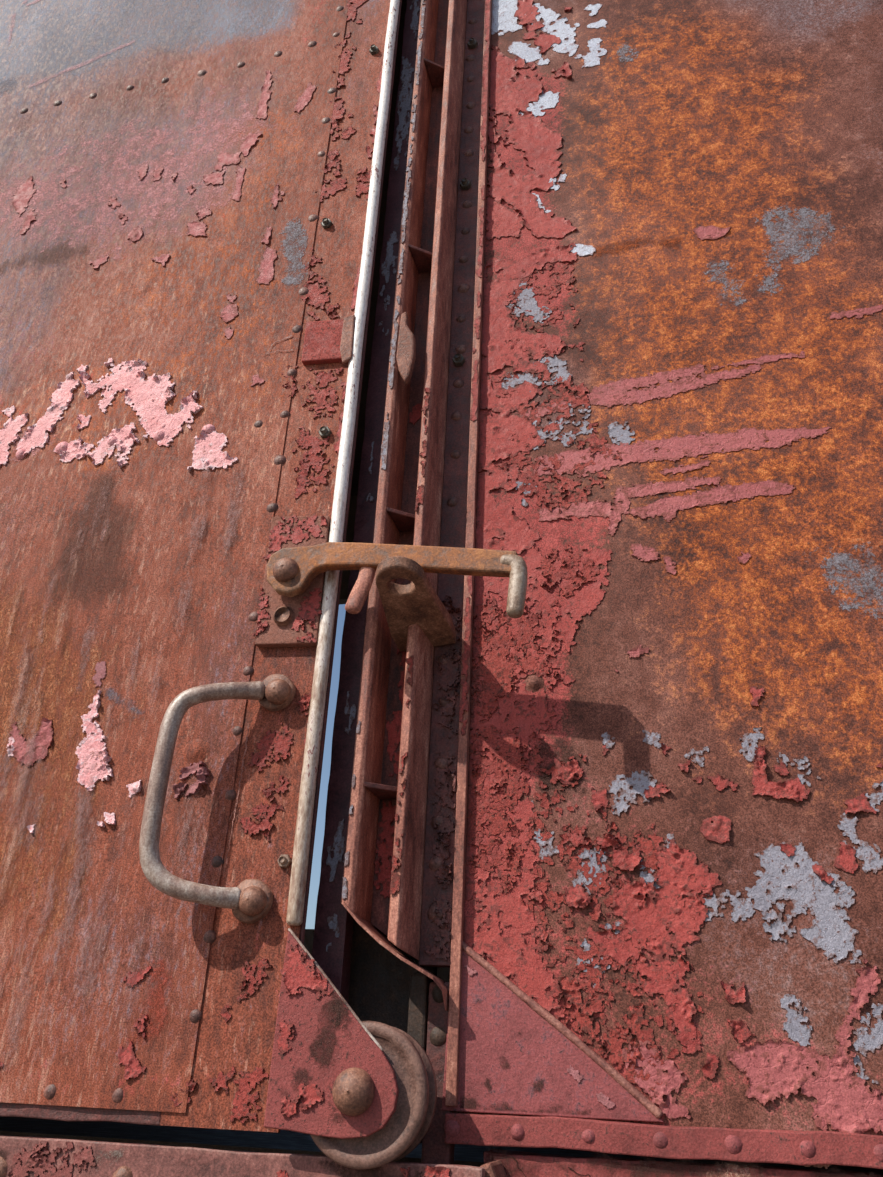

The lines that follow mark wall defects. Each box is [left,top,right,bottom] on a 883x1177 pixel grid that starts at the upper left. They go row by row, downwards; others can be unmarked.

peeling [315,0,383,203]
peeling [378,0,426,389]
peeling [300,233,360,321]
peeling [0,358,238,472]
peeling [369,412,390,473]
peeling [459,0,883,1134]
corrosion [0,601,100,786]
peeling [75,661,113,792]
peeling [97,812,116,827]
peeling [126,780,142,798]
peeling [326,804,353,900]
peeling [8,1141,97,1177]